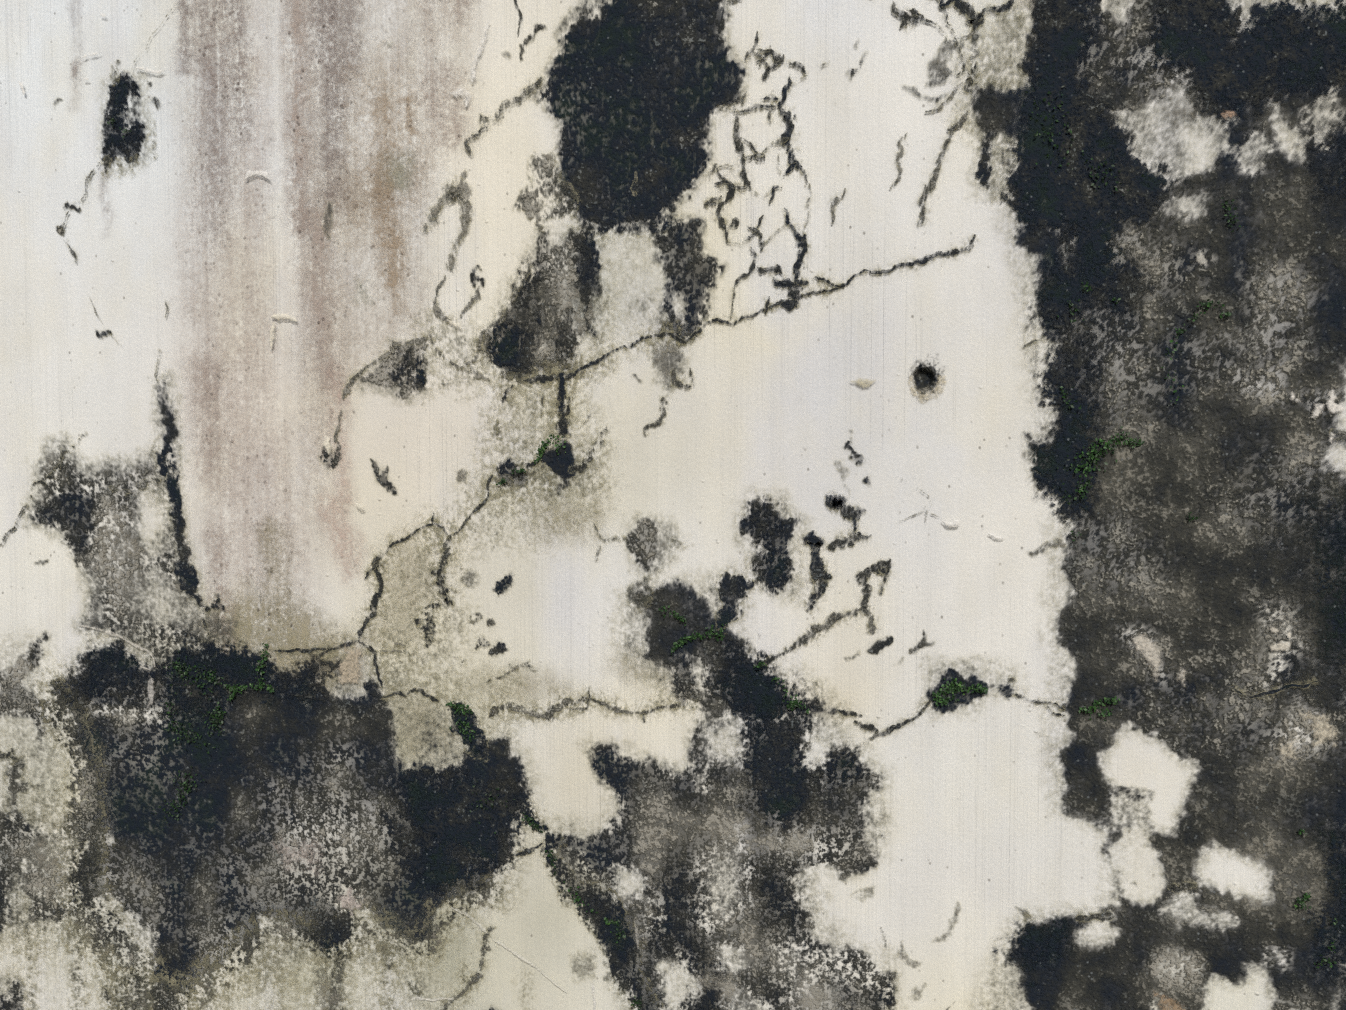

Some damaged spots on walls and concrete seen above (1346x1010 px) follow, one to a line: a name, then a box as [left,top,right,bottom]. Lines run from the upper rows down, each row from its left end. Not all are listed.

water stain [181,0,253,102]
crack [61,162,100,262]
water stain [287,68,412,400]
water stain [358,0,746,535]
crack [334,0,1014,442]
crack [274,474,493,702]
water stain [0,382,918,1010]
crack [488,667,697,722]
crack [784,495,891,652]
crack [838,700,931,740]
crack [1015,694,1065,716]
water stain [909,0,1346,1010]